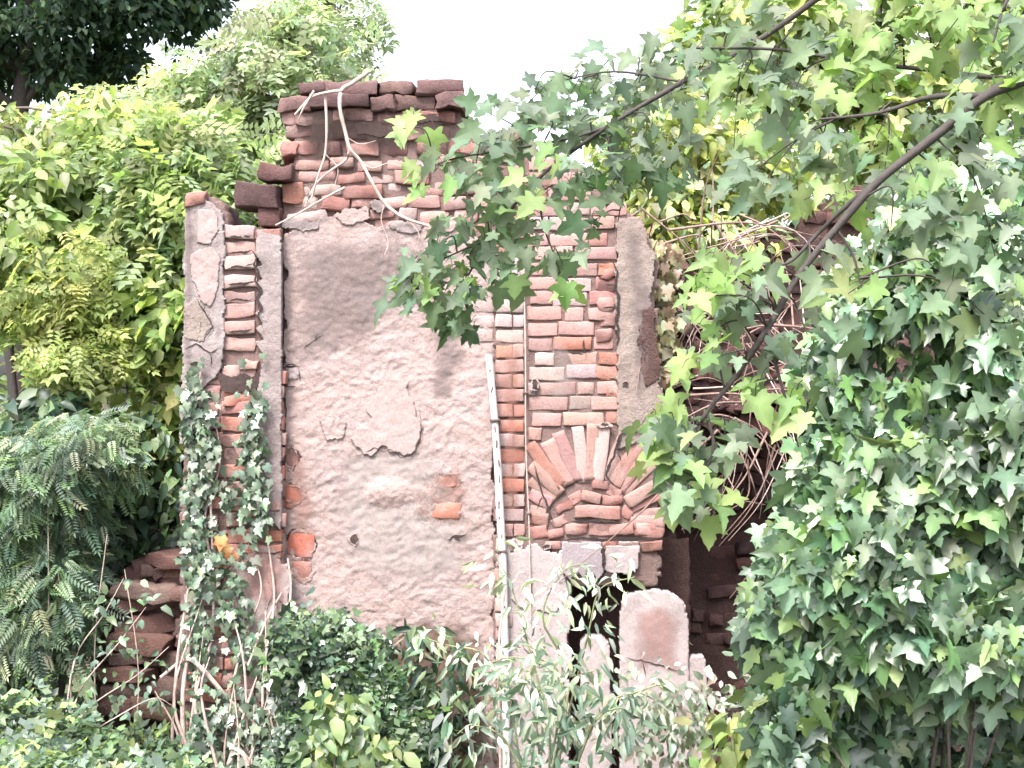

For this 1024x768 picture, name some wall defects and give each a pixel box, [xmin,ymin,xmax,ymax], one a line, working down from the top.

flaking render [282,109,492,234]
spalling [636,306,661,387]
flaking render [320,378,422,458]
spalling [282,439,308,509]
spalling [418,469,462,523]
spalling [286,528,317,584]